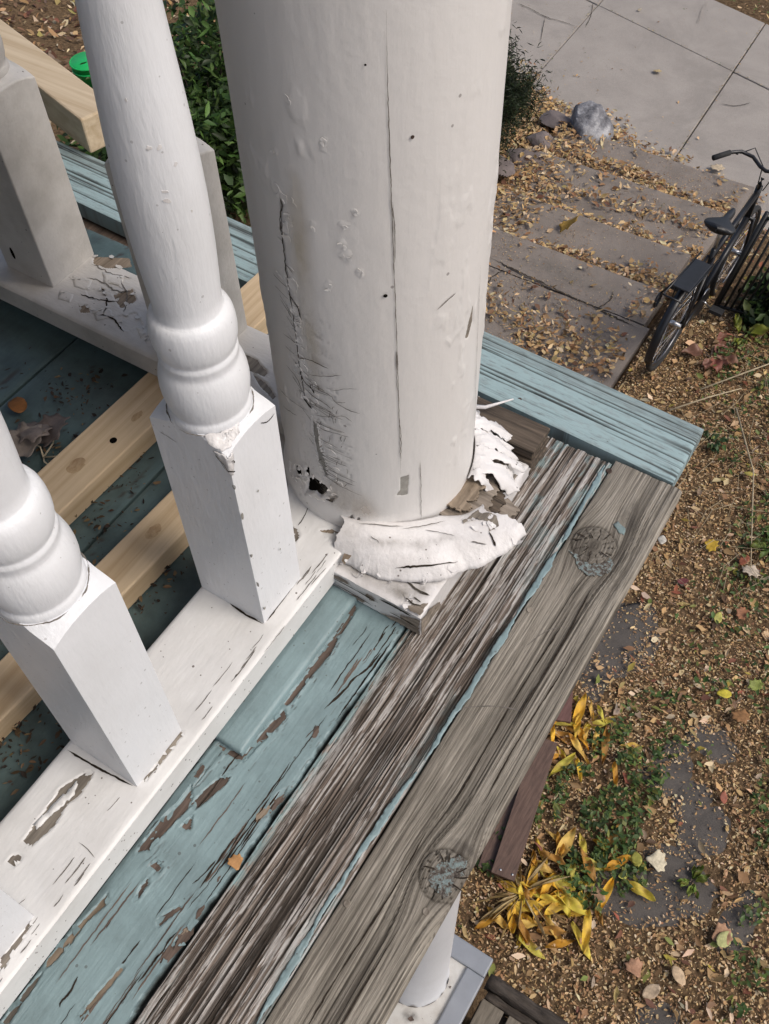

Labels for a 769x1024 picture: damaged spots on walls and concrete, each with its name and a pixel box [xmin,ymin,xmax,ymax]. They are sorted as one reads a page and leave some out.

crack [81,264,132,332]
crack [262,199,360,495]
crack [359,72,484,544]
peeling [203,422,240,490]
peeling [397,475,409,496]
peeling [472,411,525,496]
peeling [425,465,614,761]
peeling [133,553,392,906]
peeling [7,771,93,866]
peeling [0,895,112,1024]
peeling [73,968,123,1024]
peeling [257,772,417,1024]